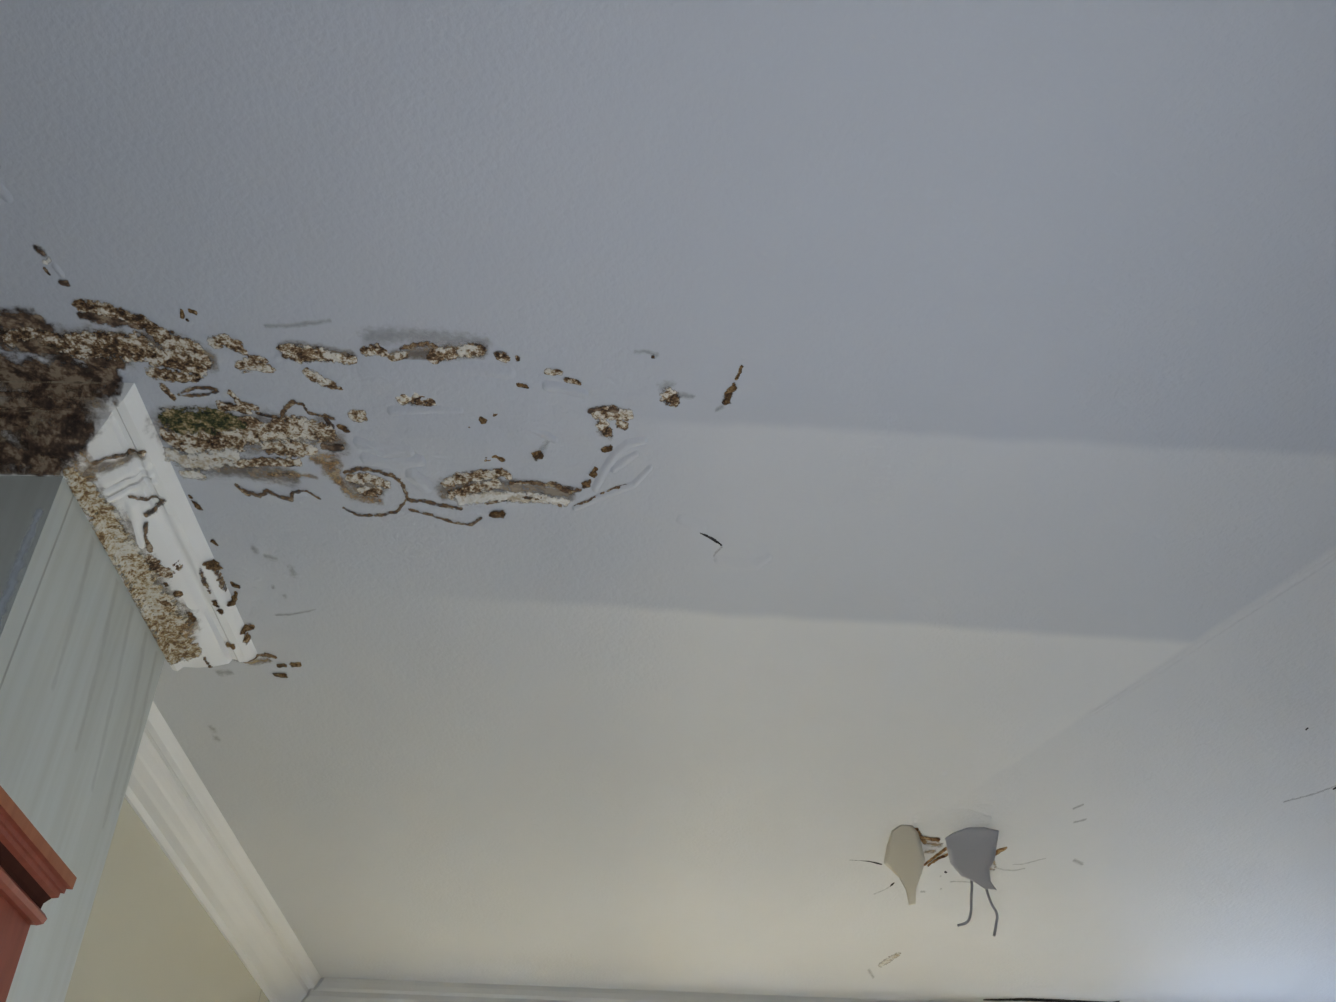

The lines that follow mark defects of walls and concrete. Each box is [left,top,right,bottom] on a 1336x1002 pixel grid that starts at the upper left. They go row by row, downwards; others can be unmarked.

peeling [2,245,520,411]
leakage [0,307,125,477]
spalling [336,409,368,433]
peeling [544,368,581,385]
spalling [588,405,634,453]
spalling [660,387,680,407]
spalling [722,365,744,405]
peeling [63,448,240,665]
spalling [225,624,255,650]
peeling [884,808,1007,906]